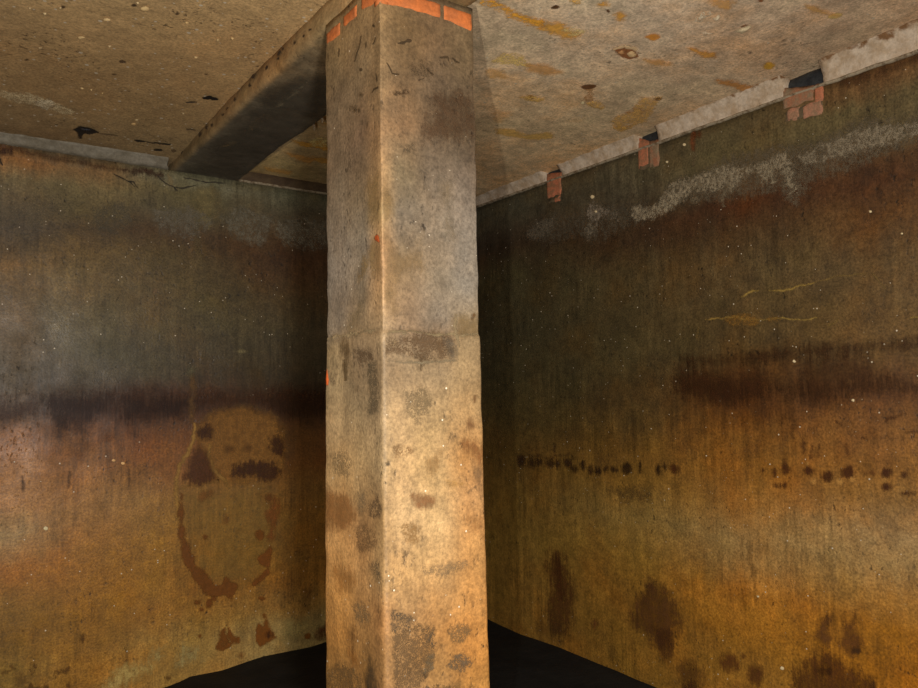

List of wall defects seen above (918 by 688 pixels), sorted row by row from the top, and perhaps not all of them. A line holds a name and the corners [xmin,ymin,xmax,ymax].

spalling [581,84,604,110]
flaking render [783,84,824,122]
crack [157,175,223,191]
flaking render [638,138,668,170]
water stain [631,119,918,221]
water stain [517,456,641,475]
water stain [391,610,435,688]